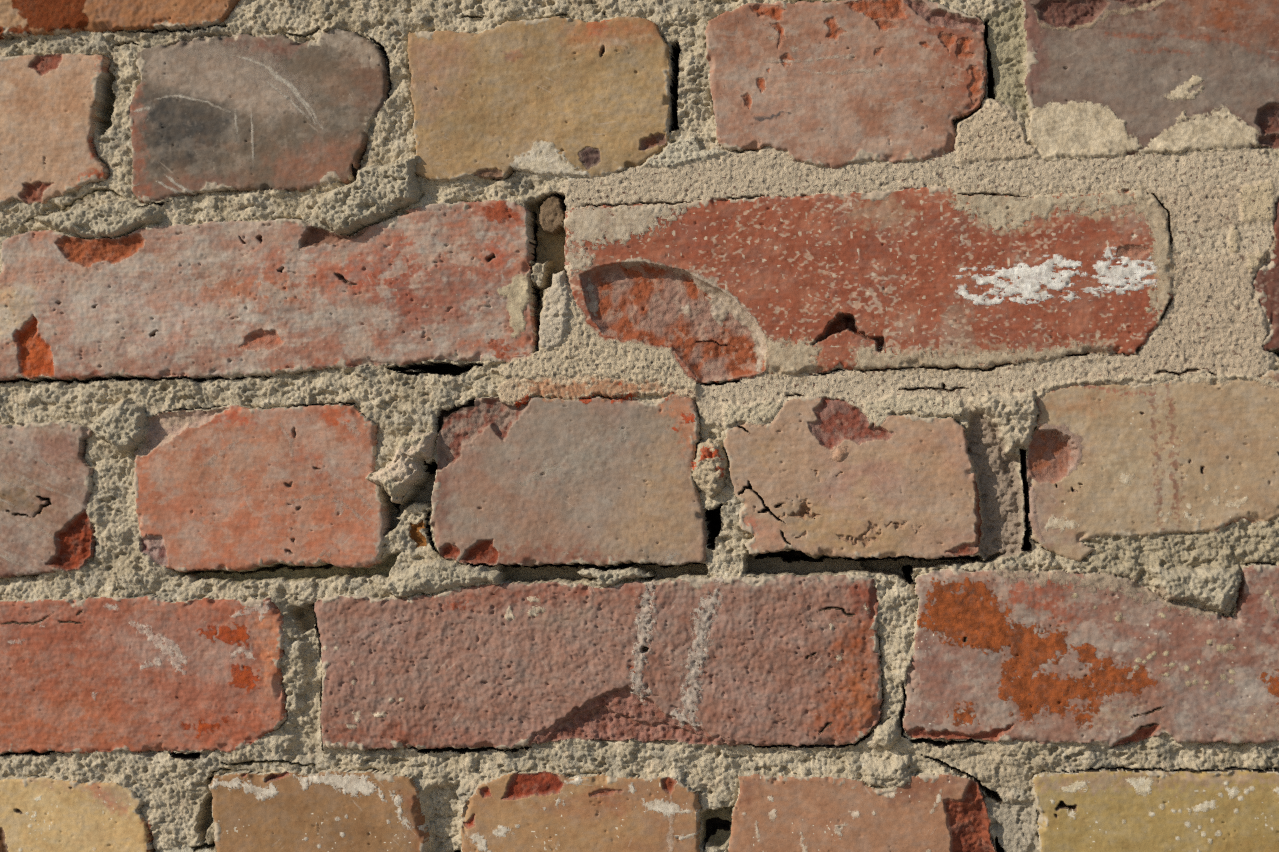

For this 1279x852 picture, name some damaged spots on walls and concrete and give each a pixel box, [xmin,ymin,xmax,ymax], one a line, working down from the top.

spalling [1255,103,1279,149]
spalling [579,262,768,383]
spalling [45,511,96,571]
crack [739,481,791,545]
spalling [0,827,8,852]
spalling [943,778,995,852]